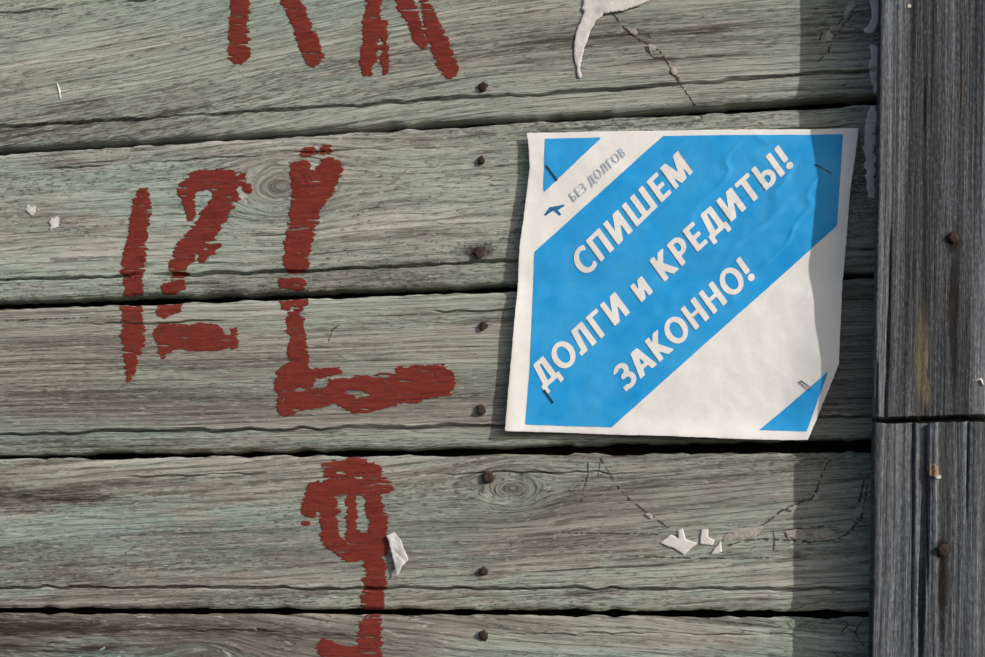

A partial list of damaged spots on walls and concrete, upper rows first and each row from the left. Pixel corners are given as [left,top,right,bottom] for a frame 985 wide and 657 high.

crack [612,13,703,118]
crack [562,458,776,559]
crack [759,459,831,526]